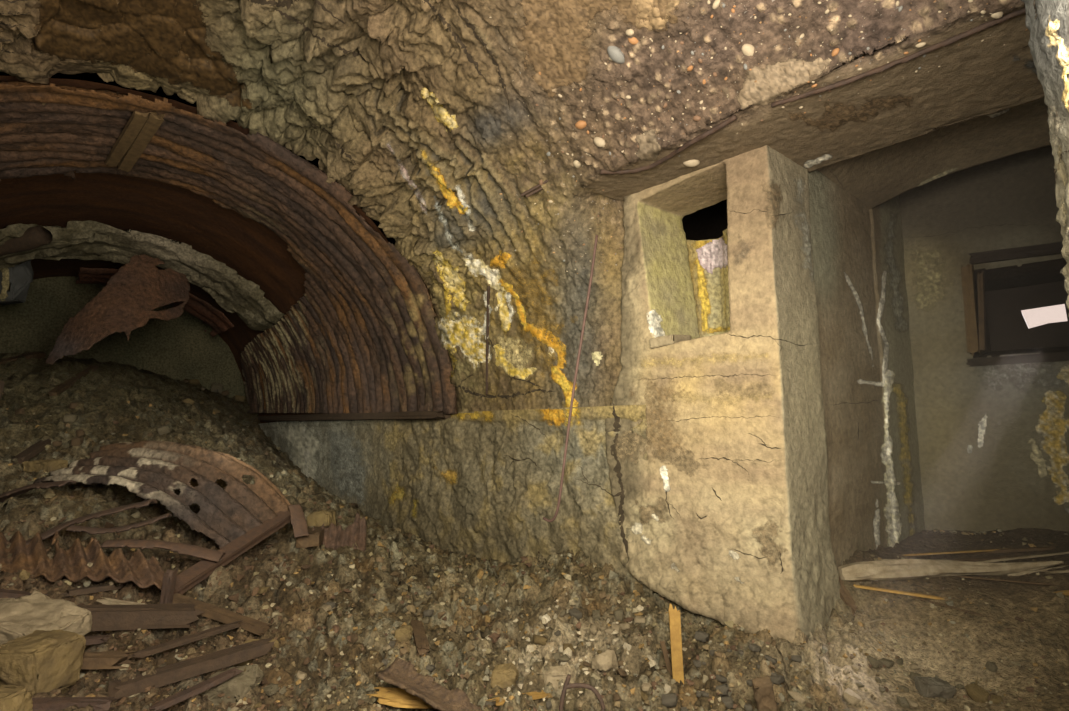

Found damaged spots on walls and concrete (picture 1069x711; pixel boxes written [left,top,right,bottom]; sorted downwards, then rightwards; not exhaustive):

damp [420,87,458,133]
damp [1045,19,1069,112]
damp [387,144,578,424]
damp [844,214,952,550]
corrosion [0,480,76,502]
corrosion [25,499,226,562]
crack [576,398,629,560]
crack [665,488,722,519]
crack [657,416,781,475]
damp [977,362,1069,513]